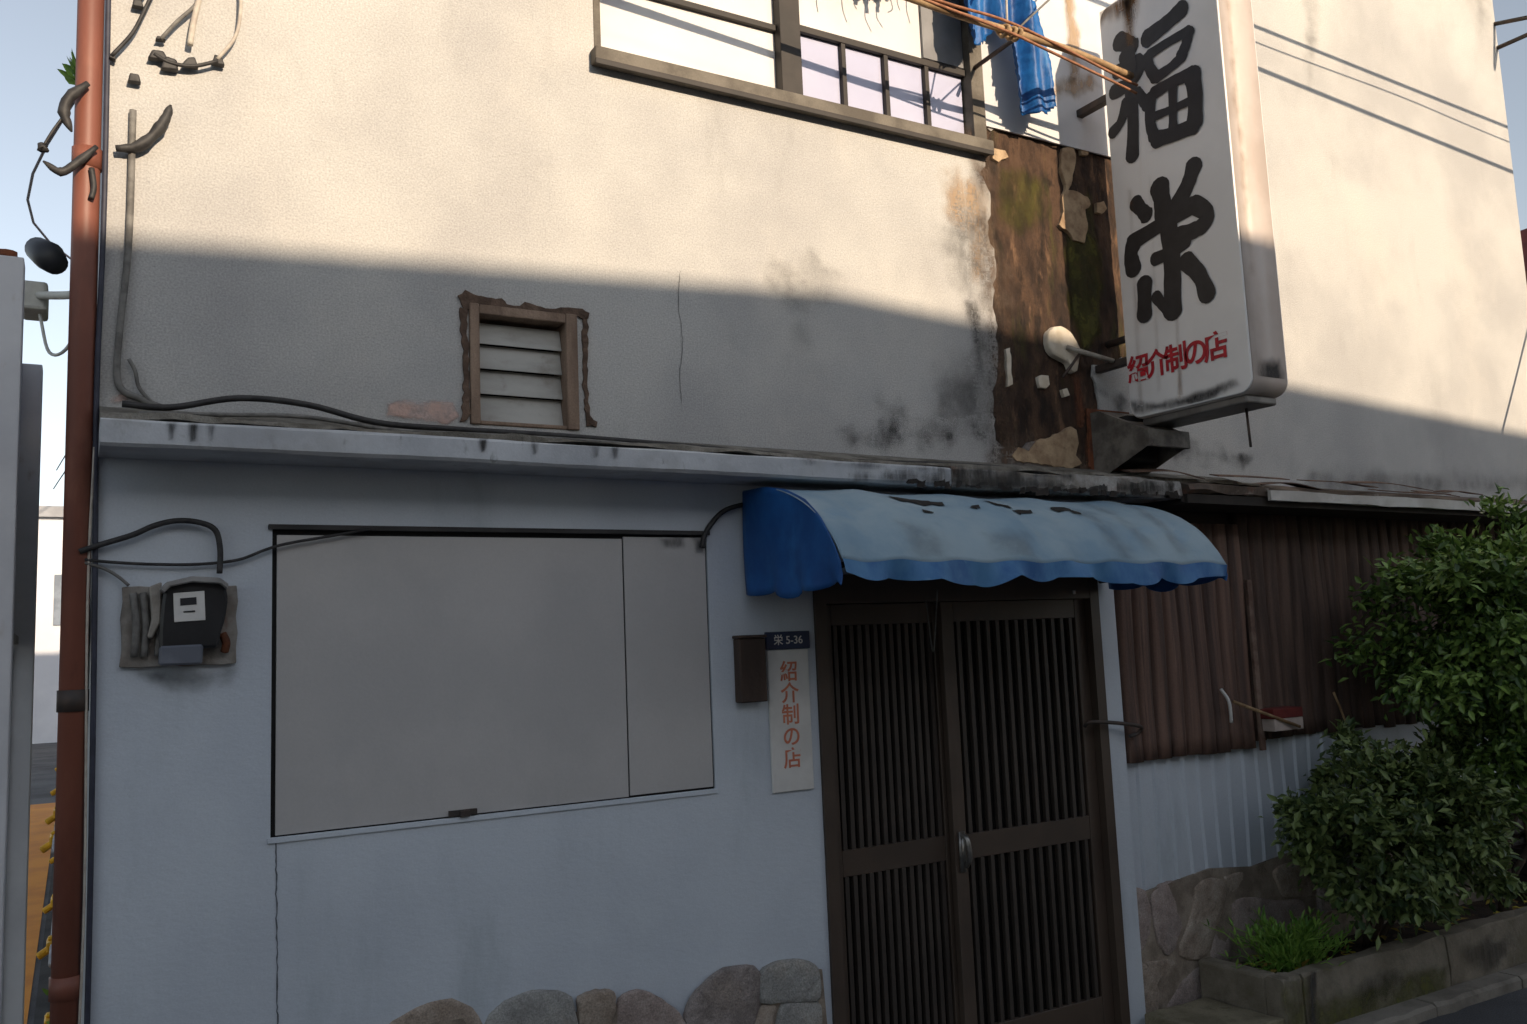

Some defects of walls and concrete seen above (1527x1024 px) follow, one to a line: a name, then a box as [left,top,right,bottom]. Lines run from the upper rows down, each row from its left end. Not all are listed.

rust [1055,0,1093,95]
spalling [388,290,597,428]
crack [676,271,684,404]
flaking render [887,129,1185,502]